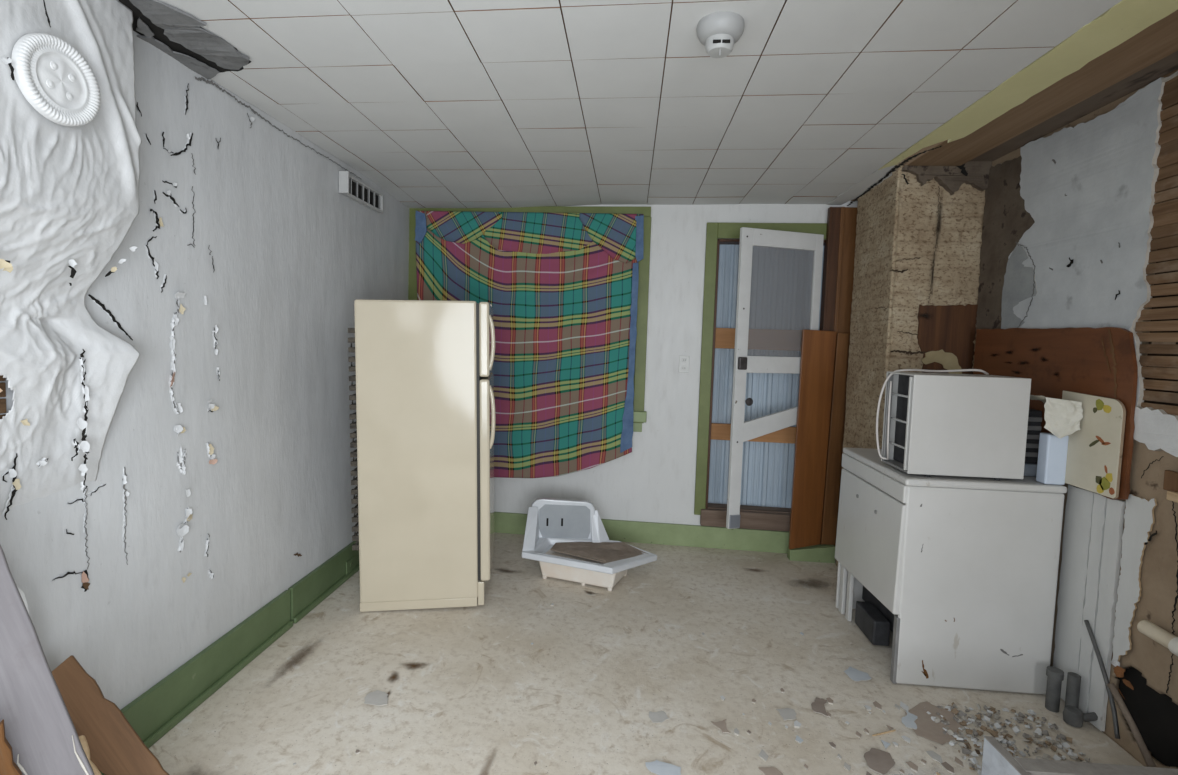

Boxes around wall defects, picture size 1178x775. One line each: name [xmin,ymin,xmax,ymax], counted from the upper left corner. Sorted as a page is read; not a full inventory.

flaking render [901,69,1178,457]
peeling [169,292,186,475]
peeling [212,325,220,381]
peeling [177,489,193,552]
spalling [1111,661,1178,767]